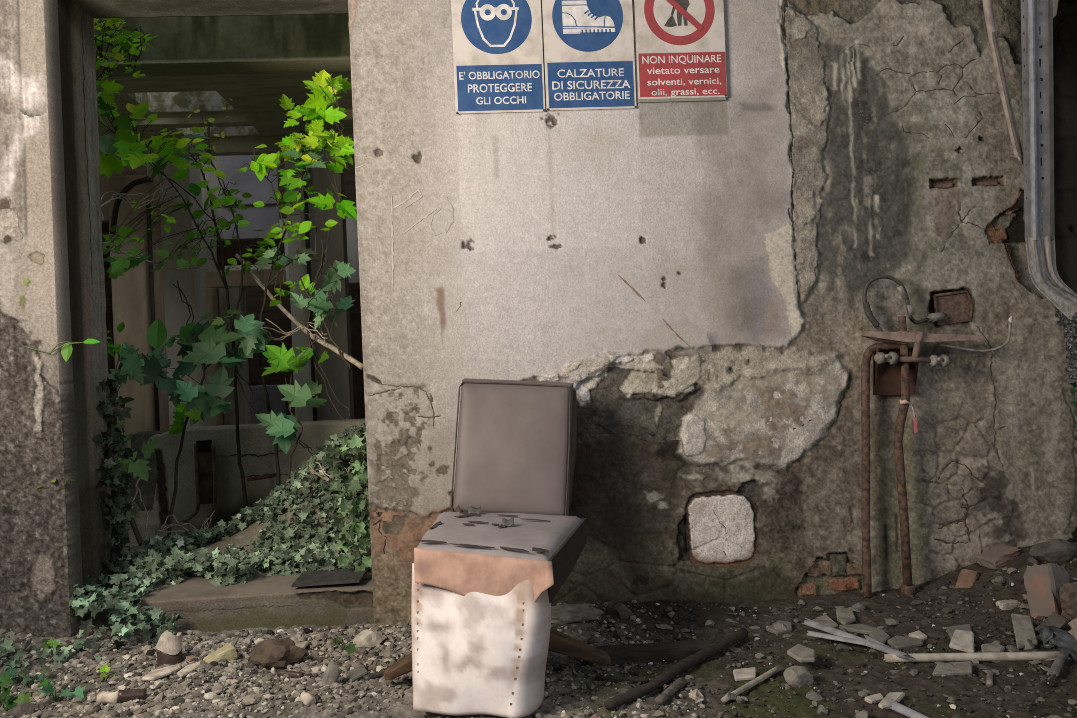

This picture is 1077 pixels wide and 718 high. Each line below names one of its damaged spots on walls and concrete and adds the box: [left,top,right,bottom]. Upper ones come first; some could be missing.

crack [822,36,999,139]
spalling [897,0,1025,64]
peeling [764,0,881,339]
leakage [816,37,912,304]
spalling [984,190,1046,299]
spalling [0,312,71,639]
peeling [367,375,448,527]
spalling [537,345,701,443]
spalling [677,515,690,561]
peeling [681,455,777,502]
crack [917,326,1005,544]
crack [1060,384,1077,533]